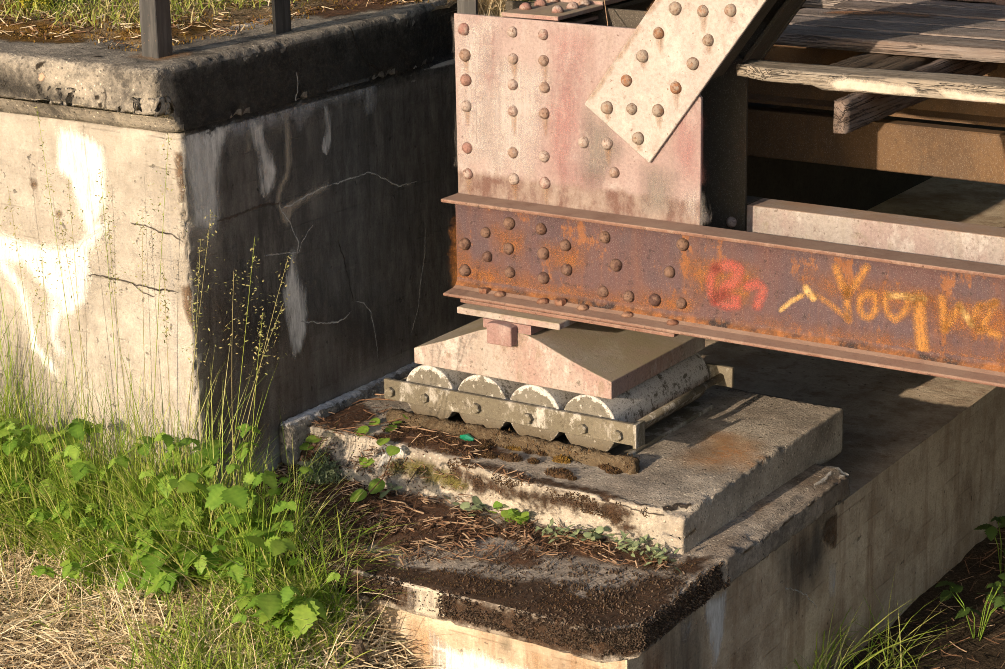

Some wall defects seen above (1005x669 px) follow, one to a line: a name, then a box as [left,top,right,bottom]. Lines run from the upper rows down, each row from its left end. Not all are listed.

crack [88,274,178,297]
crack [220,172,411,256]
leakage [185,73,466,453]
crack [303,241,378,356]